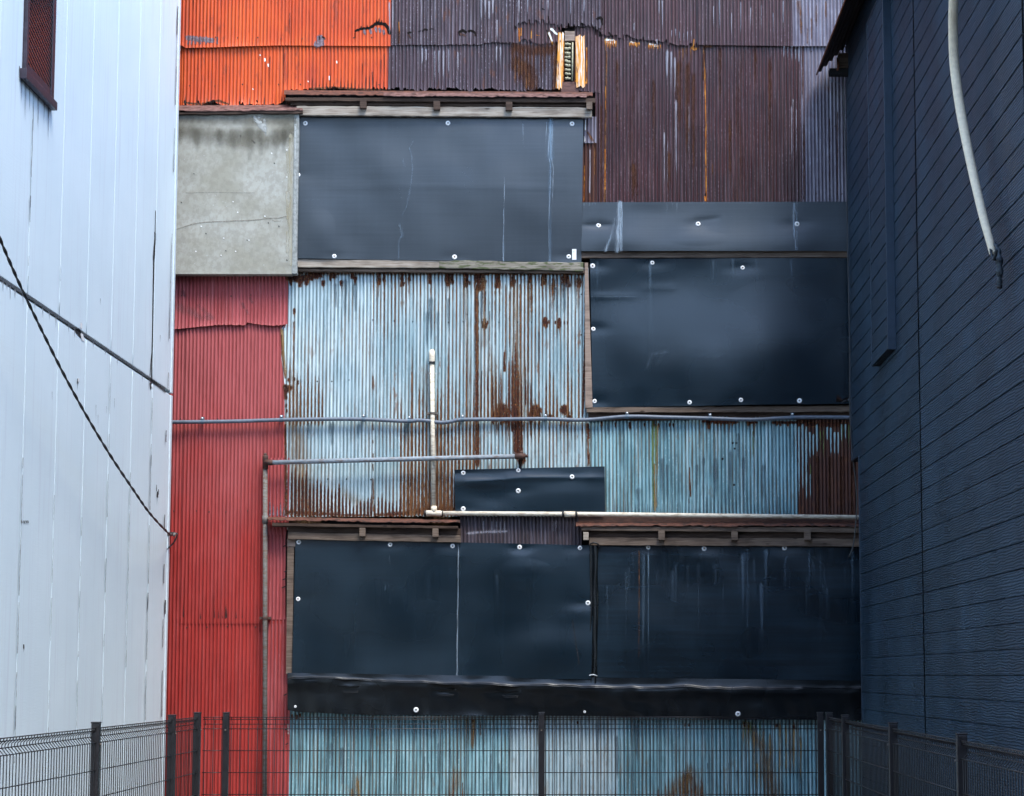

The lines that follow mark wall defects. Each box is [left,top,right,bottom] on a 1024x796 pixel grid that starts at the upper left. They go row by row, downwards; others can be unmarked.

damp [178,117,292,265]
rust [679,39,721,202]
crack [80,210,287,720]
rust [280,271,631,521]
rust [702,420,850,433]